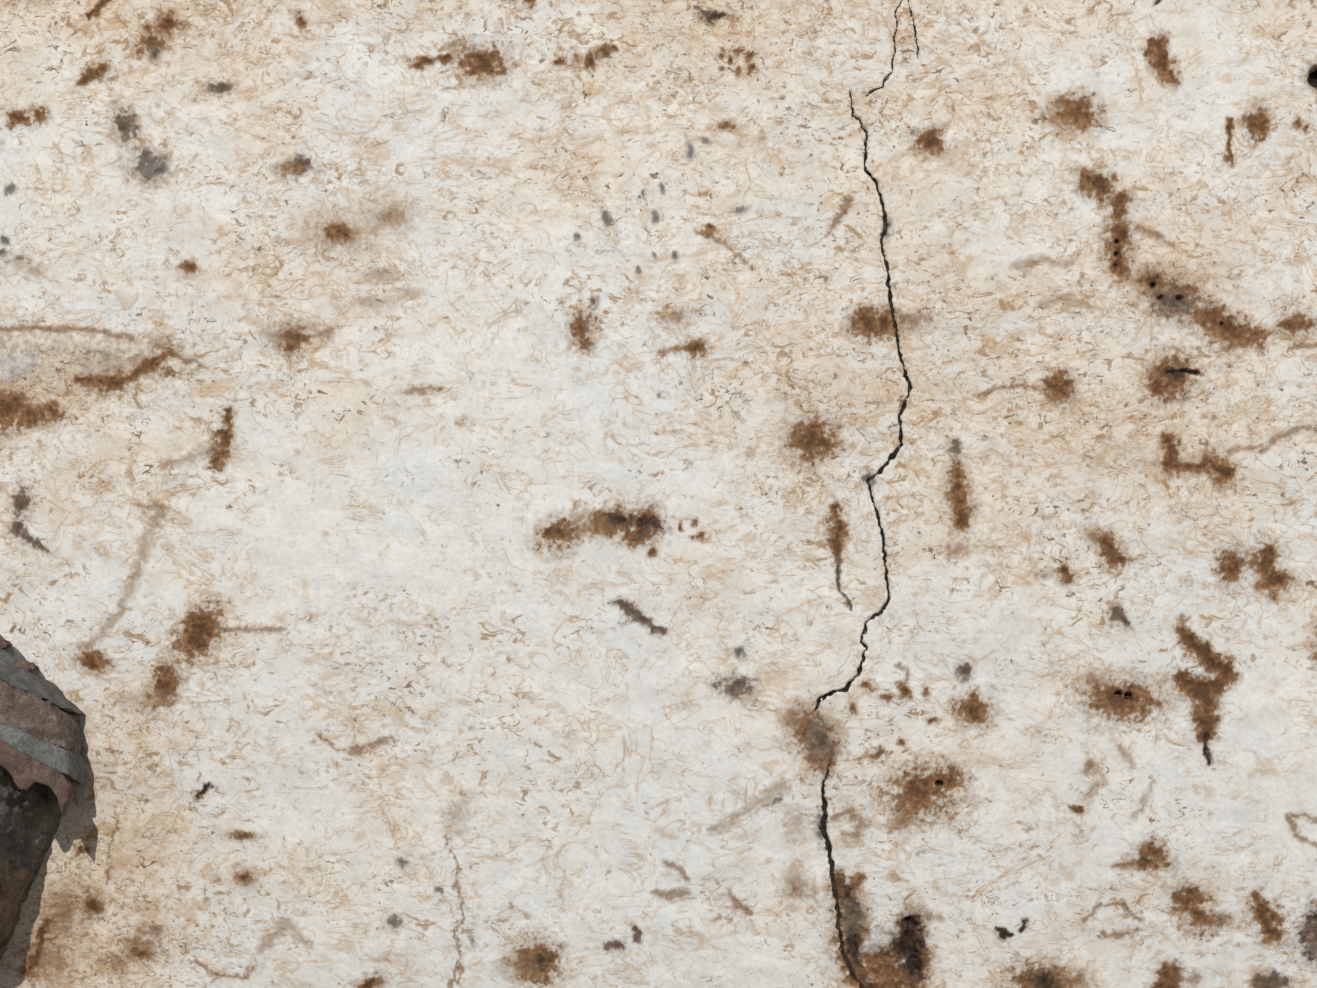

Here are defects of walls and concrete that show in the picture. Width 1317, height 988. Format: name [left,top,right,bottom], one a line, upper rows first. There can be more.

crack [815,0,919,711]
corrosion [1276,312,1317,348]
corrosion [784,415,842,466]
corrosion [1159,425,1317,488]
corrosion [533,502,665,551]
corrosion [1212,541,1295,600]
corrosion [146,600,282,710]
corrosion [831,809,867,838]
crack [813,759,866,988]
corrosion [848,872,867,892]